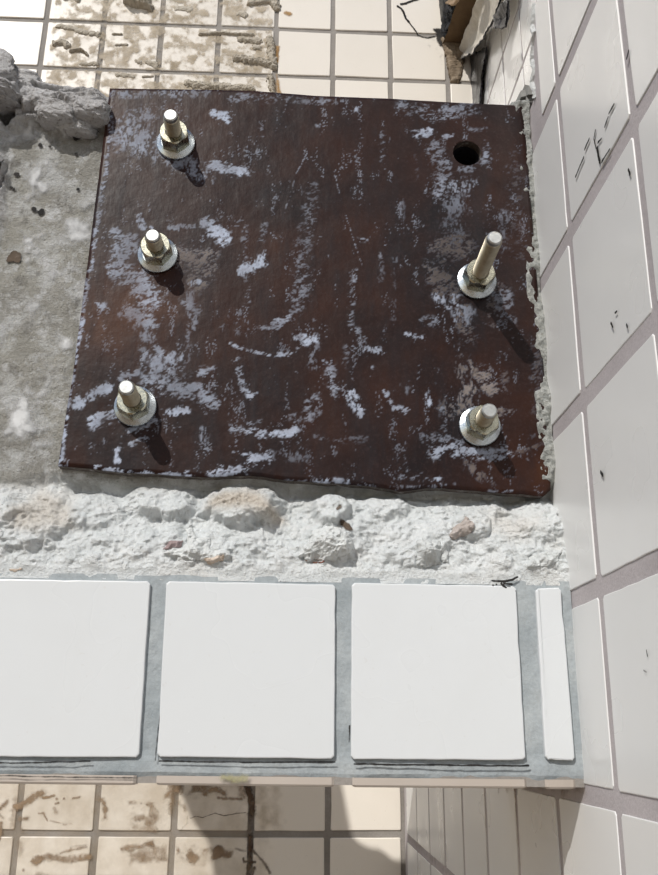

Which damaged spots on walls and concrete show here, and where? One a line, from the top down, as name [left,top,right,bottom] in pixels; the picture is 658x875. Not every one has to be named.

spalling [441,37,466,84]
leakage [13,791,44,810]
leakage [165,785,181,812]
leakage [217,786,255,821]
leakage [42,847,92,862]
leakage [121,841,165,862]
leakage [243,835,270,875]